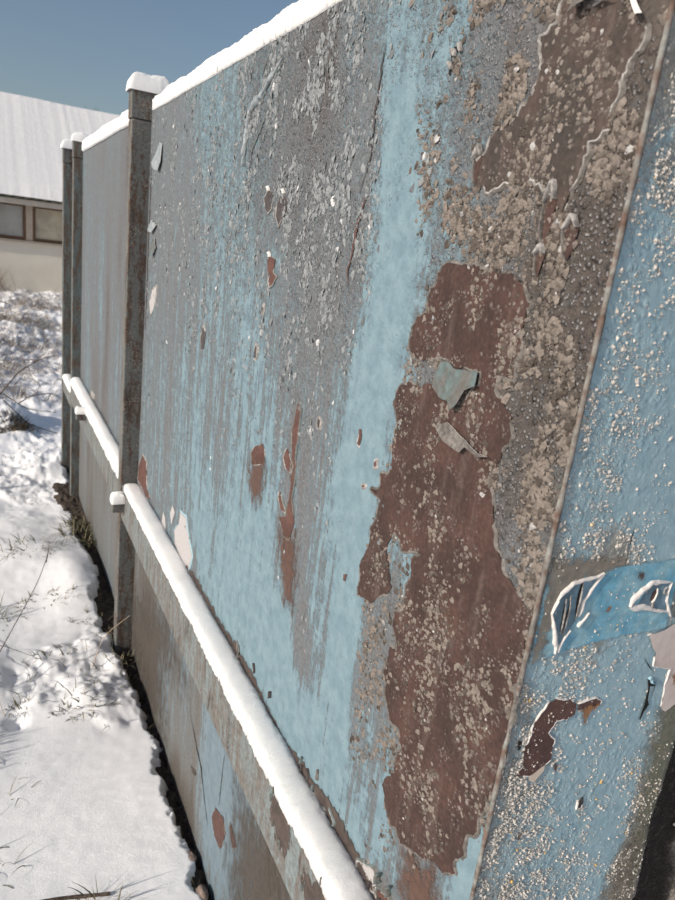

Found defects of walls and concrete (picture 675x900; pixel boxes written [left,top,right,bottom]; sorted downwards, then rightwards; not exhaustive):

peeling [447,42,463,75]
peeling [409,127,438,200]
peeling [470,0,652,276]
rust [247,453,267,504]
peeling [138,0,402,900]
rust [277,530,298,615]
peeling [356,259,602,876]
peeling [647,624,675,711]